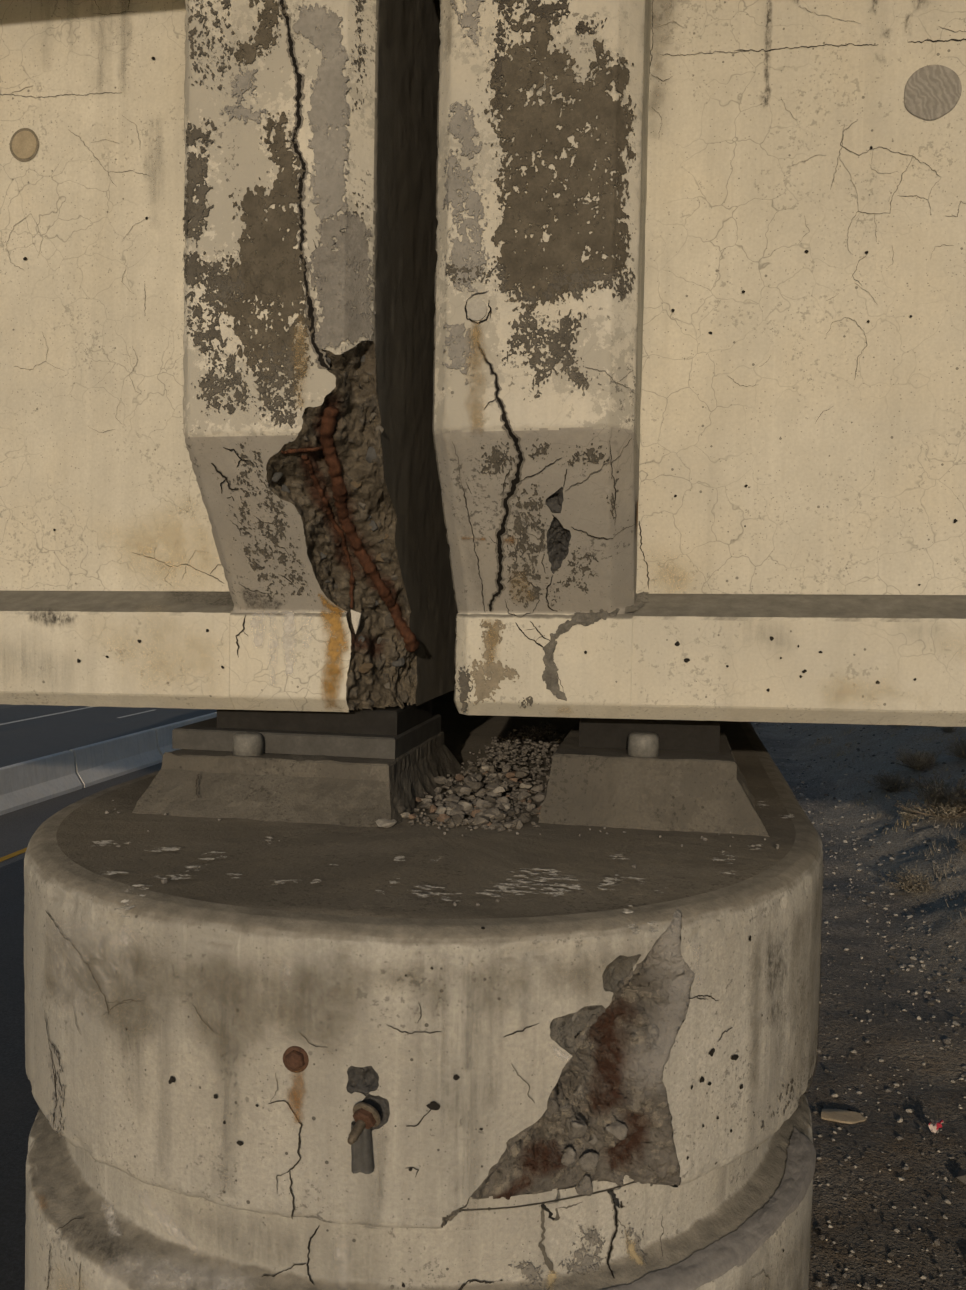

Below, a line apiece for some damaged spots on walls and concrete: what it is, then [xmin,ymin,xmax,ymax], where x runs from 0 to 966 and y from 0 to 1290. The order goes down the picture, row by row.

spalling [182,0,419,711]
crack [278,0,344,369]
corrosion [318,594,347,706]
spalling [477,439,599,610]
peeling [442,0,637,400]
crack [452,291,650,701]
peeling [564,439,618,519]
crack [790,121,963,380]
crack [47,1218,81,1290]
crack [262,1073,320,1285]
spalling [441,906,695,1226]